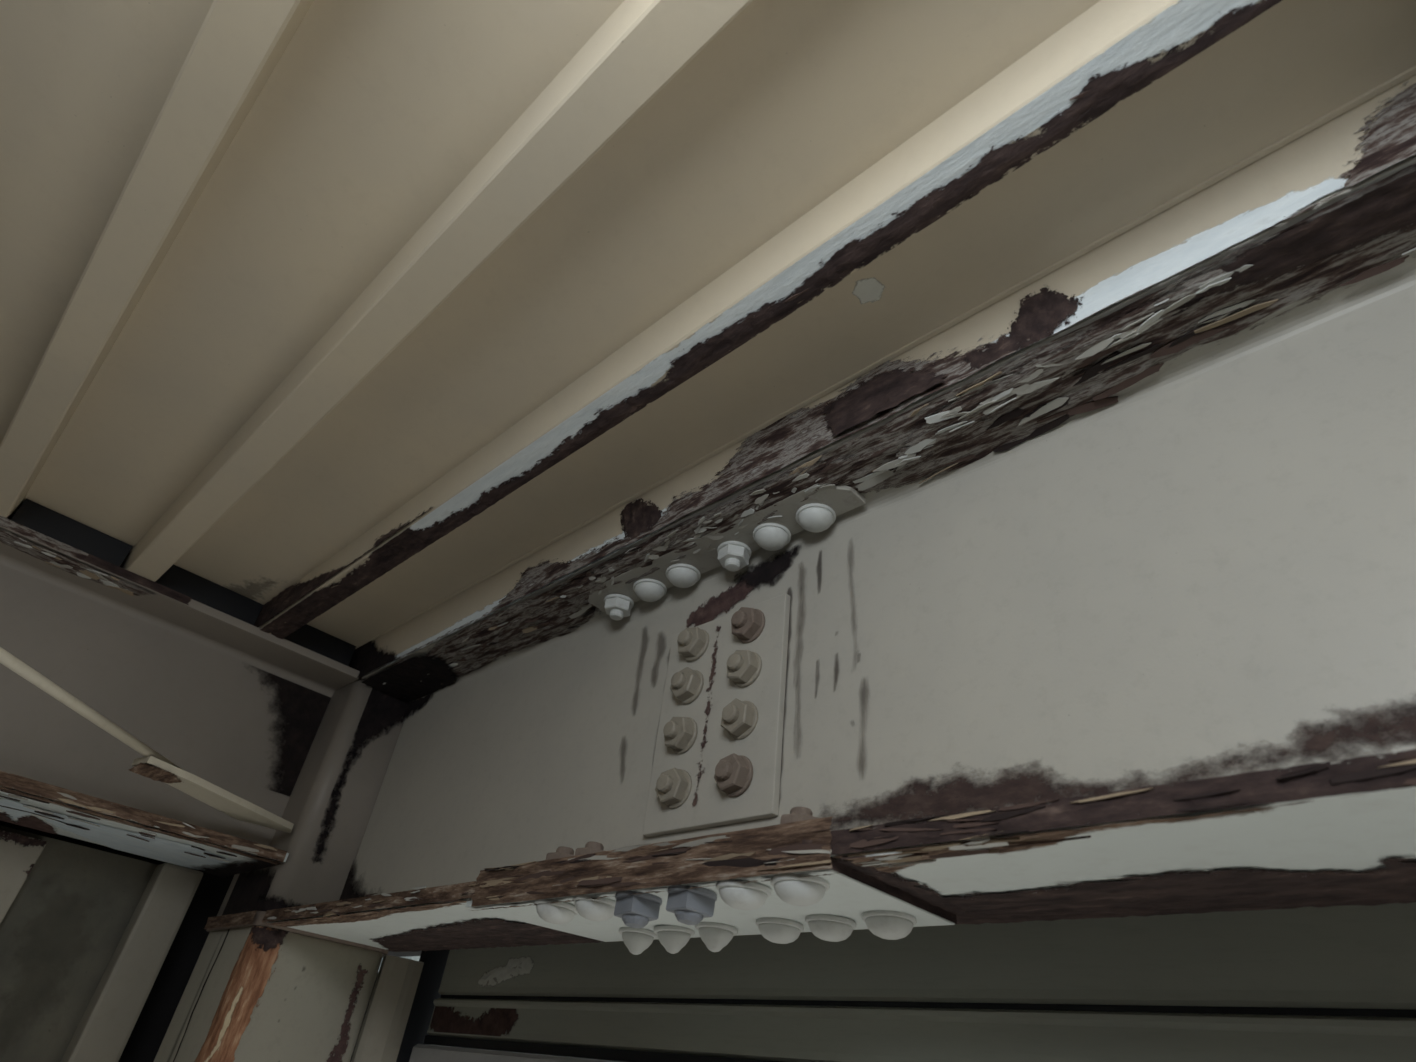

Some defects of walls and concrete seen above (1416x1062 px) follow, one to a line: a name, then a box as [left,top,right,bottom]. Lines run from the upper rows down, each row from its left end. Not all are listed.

peeling [410,0,1261,531]
peeling [1339,248,1416,286]
peeling [381,177,1347,685]
rust [686,546,799,806]
peeling [0,794,254,870]
rust [312,688,433,862]
rust [479,861,536,901]
rust [194,886,457,1062]
rust [430,1006,518,1036]